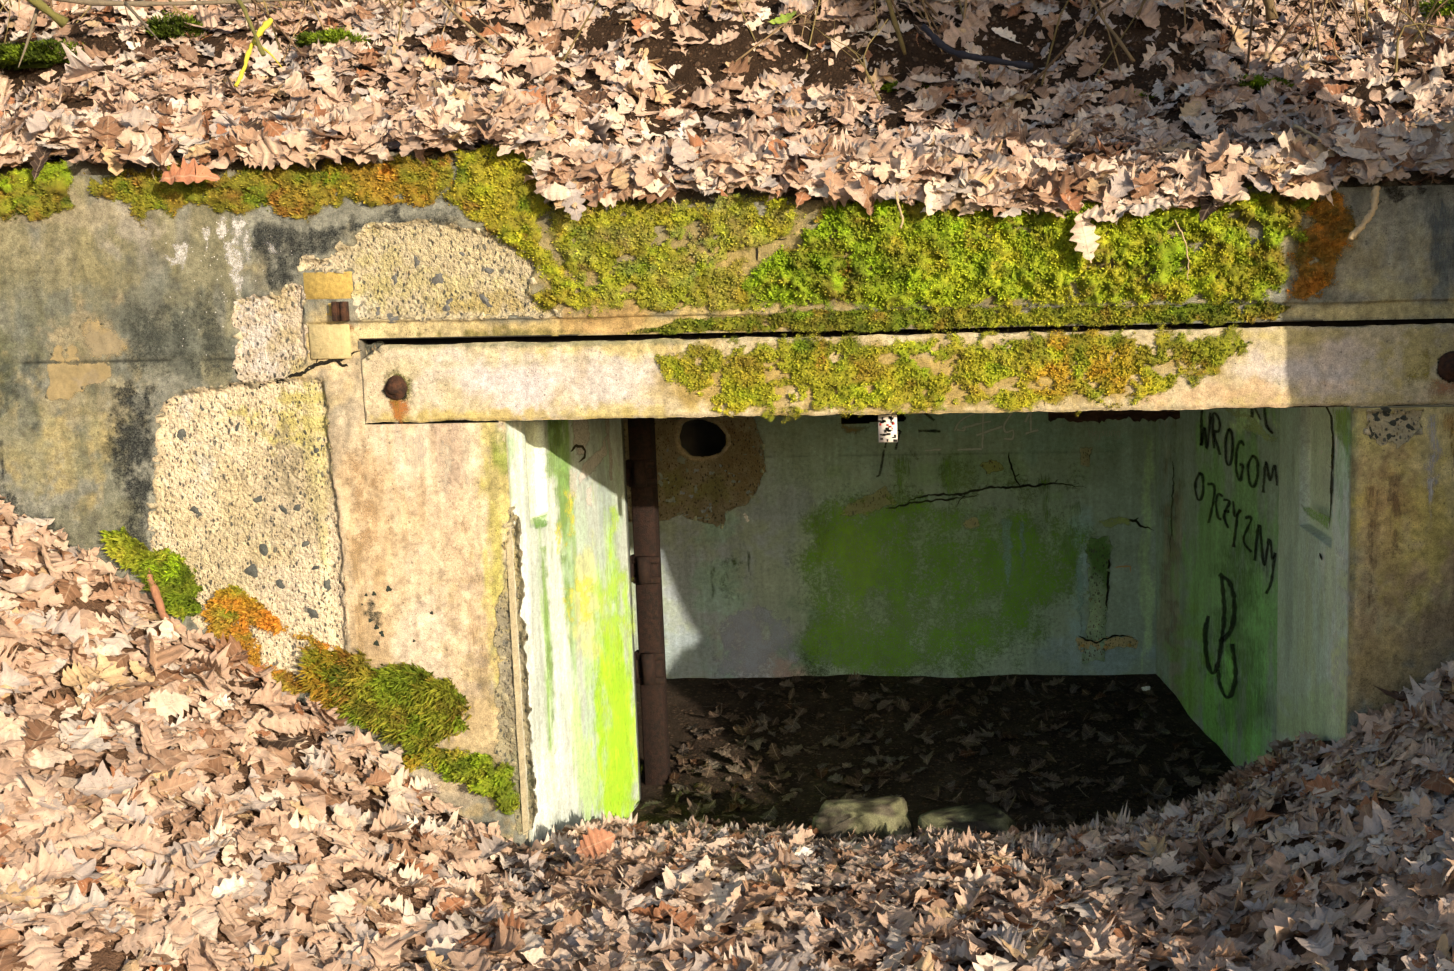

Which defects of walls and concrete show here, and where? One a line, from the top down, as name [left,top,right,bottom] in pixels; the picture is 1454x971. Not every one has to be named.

spalling [146,218,563,686]
rust [390,399,409,423]
flaking render [655,417,766,529]
crack [886,454,1086,509]
damp [541,546,571,695]